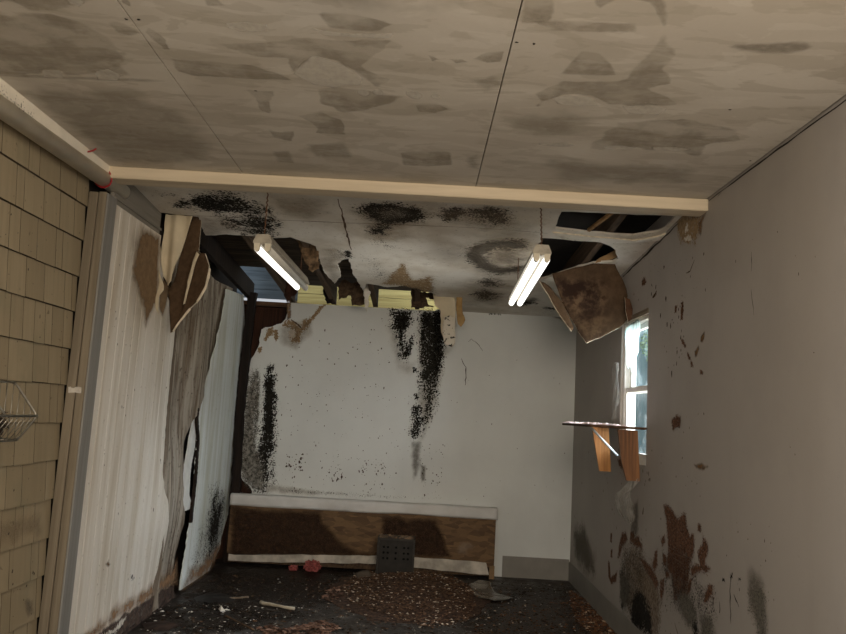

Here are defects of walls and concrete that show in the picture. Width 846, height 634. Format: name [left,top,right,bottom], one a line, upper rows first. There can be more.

water stain [155,190,284,238]
flaking render [676,214,705,247]
flaking render [258,300,326,353]
water stain [388,308,446,480]
water stain [241,364,280,494]
water stain [87,481,367,634]
water stain [382,517,449,556]
flaking render [608,504,713,634]
water stain [747,576,769,634]